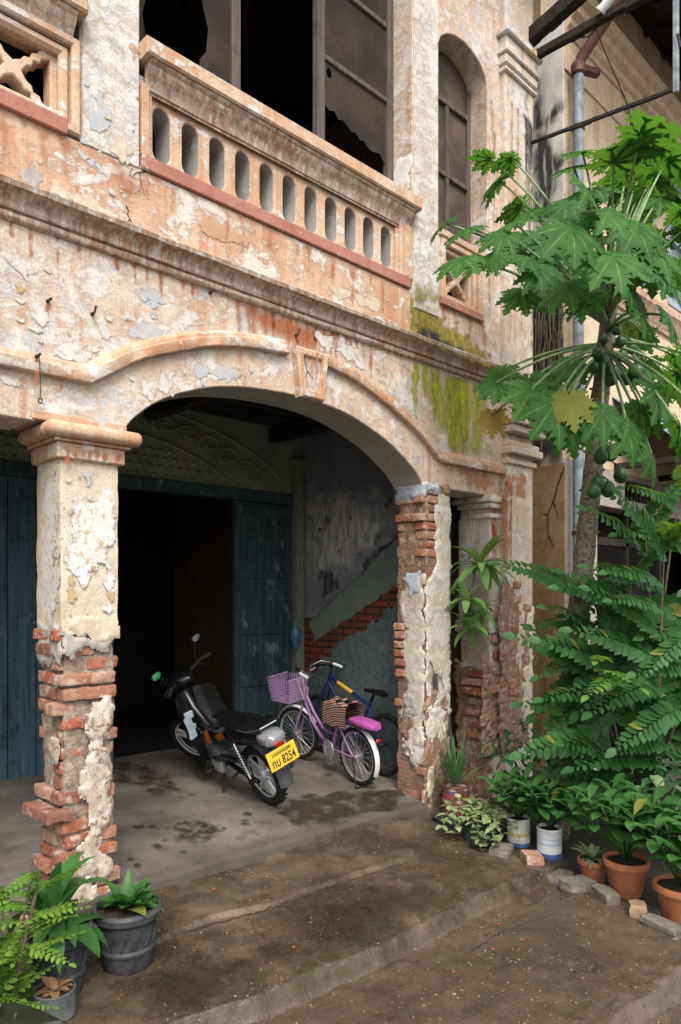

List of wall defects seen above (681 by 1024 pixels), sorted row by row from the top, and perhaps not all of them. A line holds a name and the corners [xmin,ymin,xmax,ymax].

peeling [17,160,134,224]
peeling [72,80,140,195]
leakage [524,97,564,218]
peeling [53,287,177,364]
leakage [532,259,564,391]
peeling [128,363,253,401]
leakage [411,363,480,454]
leakage [533,432,561,460]
crack [540,467,565,554]
flaking render [22,460,121,903]
flaking render [304,480,536,819]
leakage [279,790,405,825]